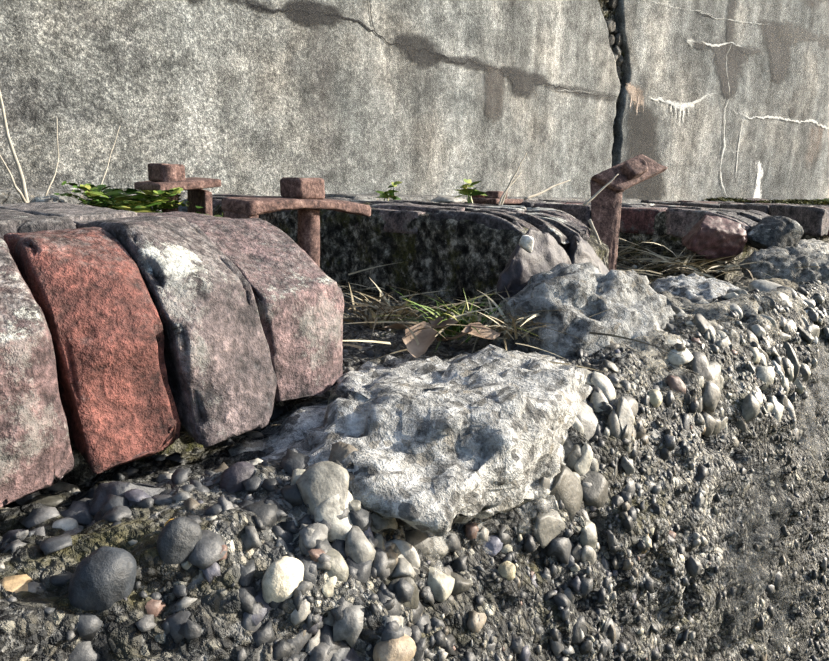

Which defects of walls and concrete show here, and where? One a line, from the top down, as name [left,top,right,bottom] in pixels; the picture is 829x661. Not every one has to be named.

water stain [233,0,273,13]
water stain [284,0,342,26]
crack [246,0,448,58]
water stain [396,34,611,120]
crack [548,0,625,158]
crack [643,0,766,25]
water stain [693,0,829,99]
water stain [628,104,660,163]
crack [650,39,829,196]
water stain [624,174,666,200]
efflorescence [753,162,763,198]